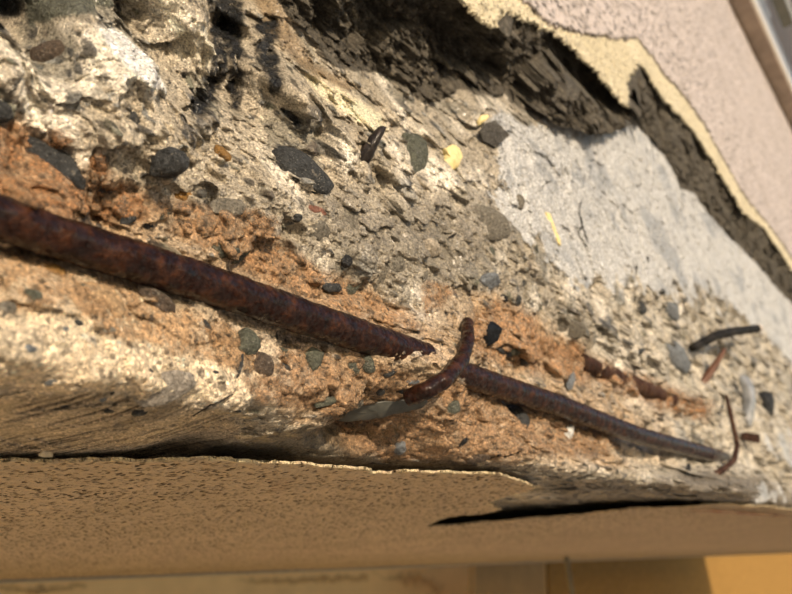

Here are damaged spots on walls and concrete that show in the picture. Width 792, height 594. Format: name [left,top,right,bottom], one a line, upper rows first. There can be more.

spalling [190,0,244,116]
spalling [24,136,86,195]
spalling [149,146,190,178]
spalling [402,132,428,175]
peeling [458,0,792,271]
corrosion [0,123,415,331]
spalling [423,238,442,258]
spalling [137,284,176,336]
corrosion [0,251,615,462]
spalling [666,341,691,374]
corrosion [599,368,707,419]
spalling [758,391,775,416]